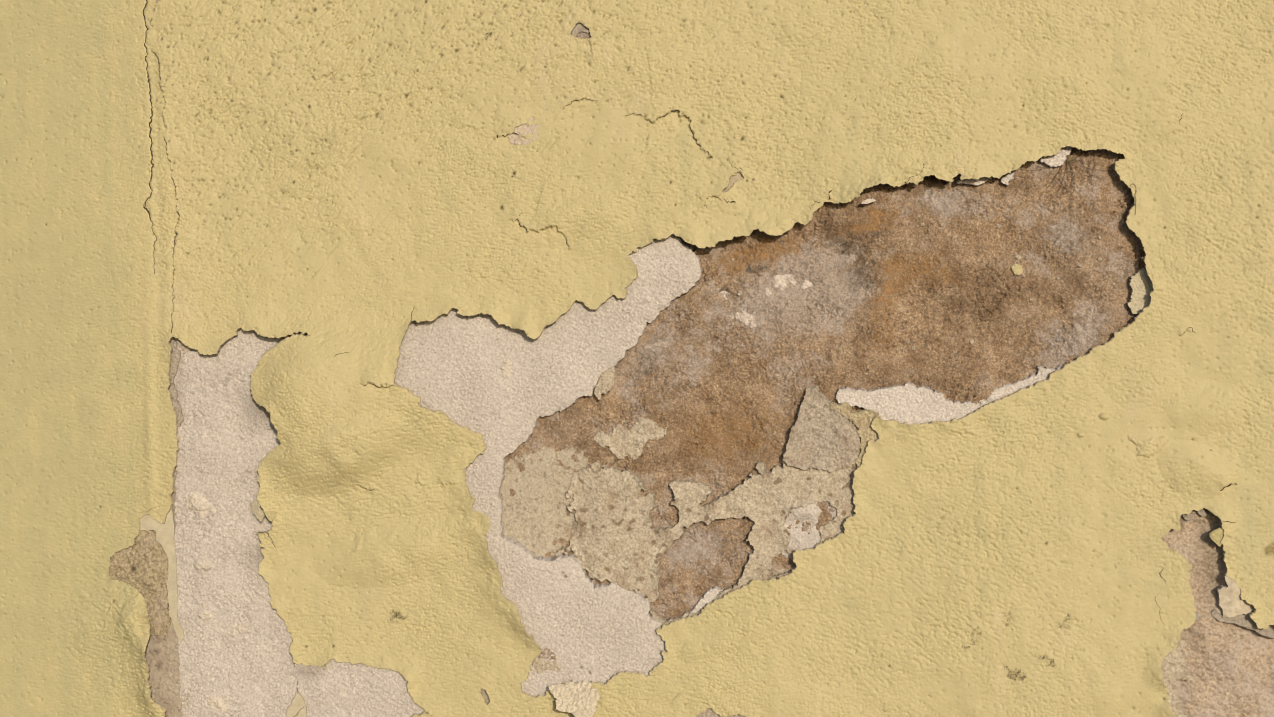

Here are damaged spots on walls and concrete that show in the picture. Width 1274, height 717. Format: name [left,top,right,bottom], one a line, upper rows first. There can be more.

crack [143,0,180,333]
peeling [108,328,432,717]
spalling [394,146,1154,717]
peeling [1160,508,1274,717]